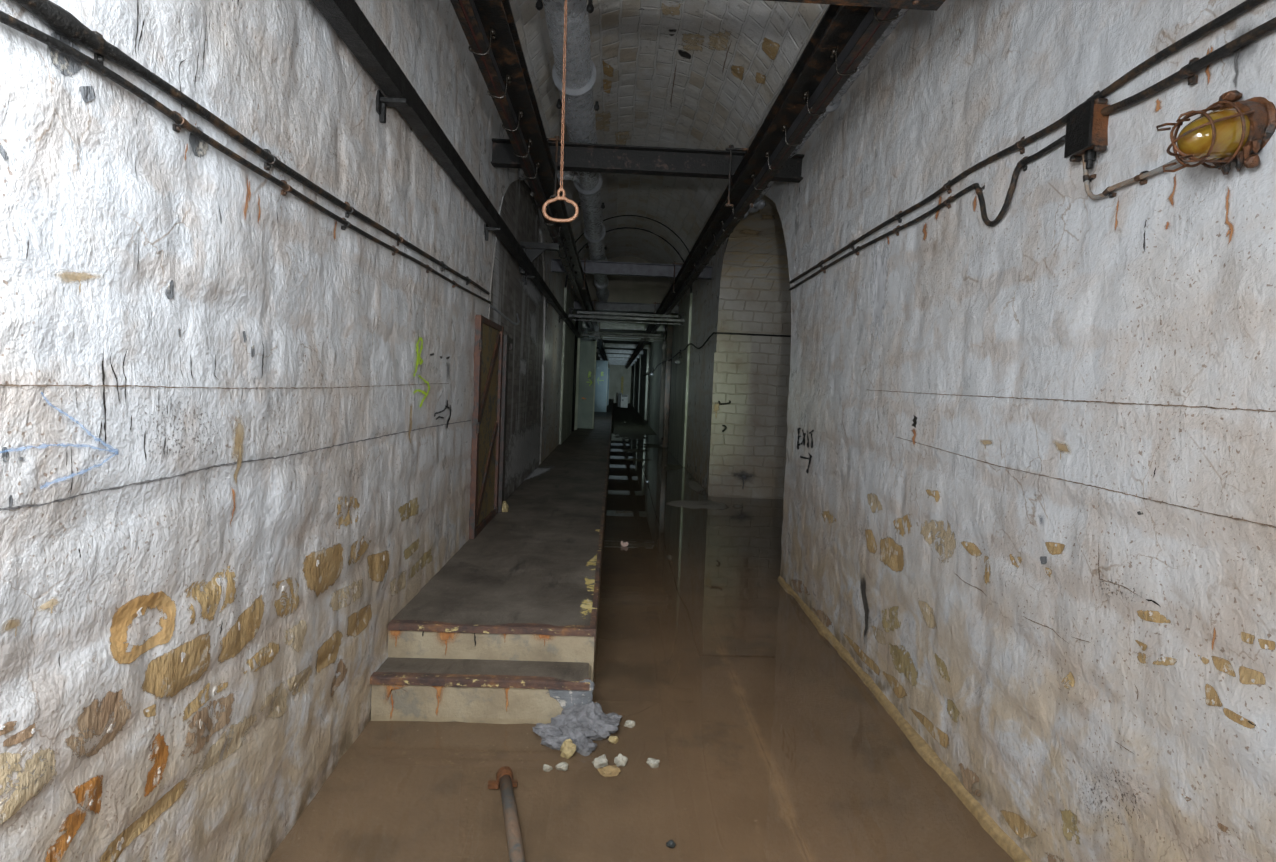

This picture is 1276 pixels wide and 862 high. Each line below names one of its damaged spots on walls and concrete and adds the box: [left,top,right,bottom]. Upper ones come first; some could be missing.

corrosion [1225,189,1233,244]
flaking render [865,514,991,585]
flaking render [1040,542,1065,577]
flaking render [0,496,432,862]
flaking render [844,606,963,748]
flaking render [1135,640,1177,666]
flaking render [1198,655,1266,685]
flaking render [1241,632,1276,650]
flaking render [1205,684,1255,729]